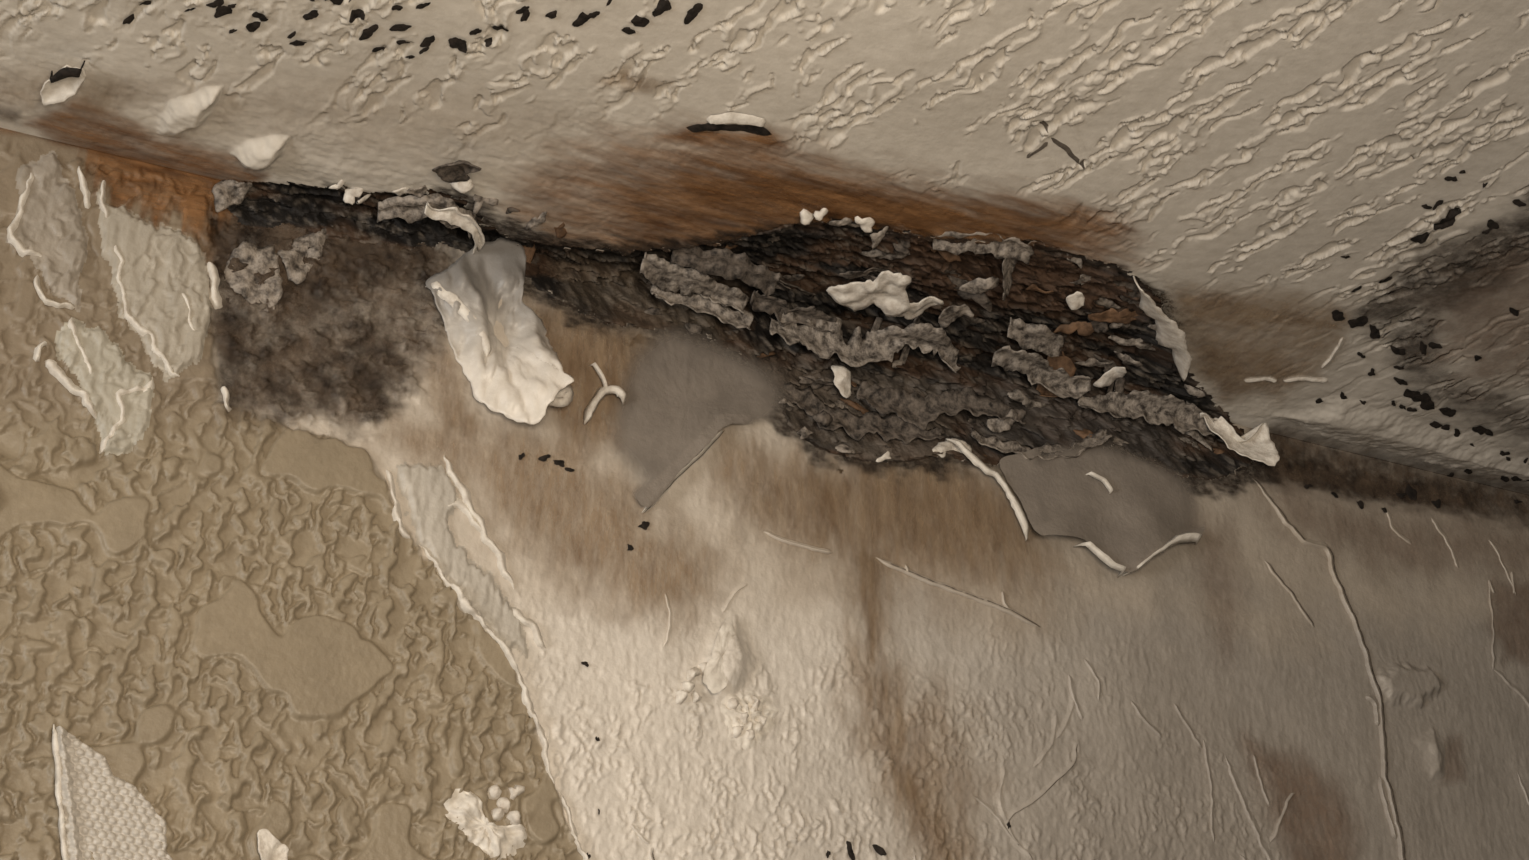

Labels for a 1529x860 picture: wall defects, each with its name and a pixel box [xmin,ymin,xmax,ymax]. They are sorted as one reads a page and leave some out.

damp [184,0,268,33]
damp [287,0,612,59]
damp [622,0,703,35]
corrosion [36,105,260,232]
corrosion [524,131,1113,258]
damp [524,276,760,443]
flaking render [5,150,1280,577]
damp [1098,199,1529,518]
flaking render [385,455,589,860]
crack [1252,478,1406,860]
peeling [257,829,289,860]
damp [826,841,855,860]